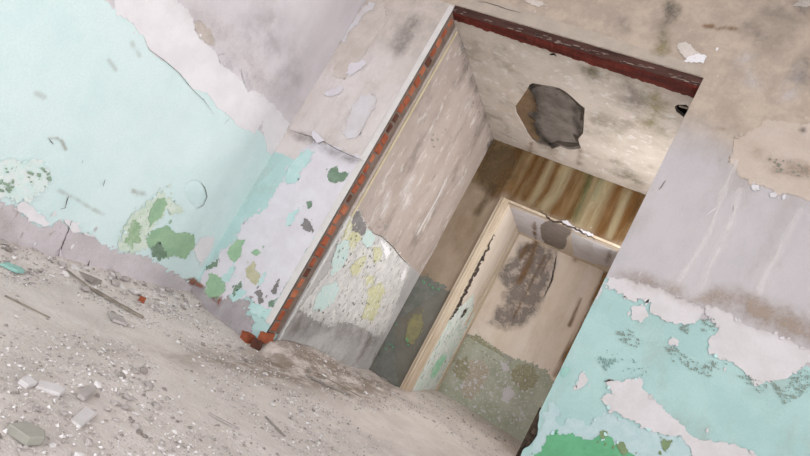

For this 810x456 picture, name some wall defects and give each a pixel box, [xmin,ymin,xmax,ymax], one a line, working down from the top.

peeling [0,0,455,351]
flaking render [516,83,585,149]
peeling [728,116,810,201]
crack [540,210,595,240]
crack [450,235,495,320]
damp [495,244,554,326]
peeling [411,294,757,456]
peeling [593,272,810,404]